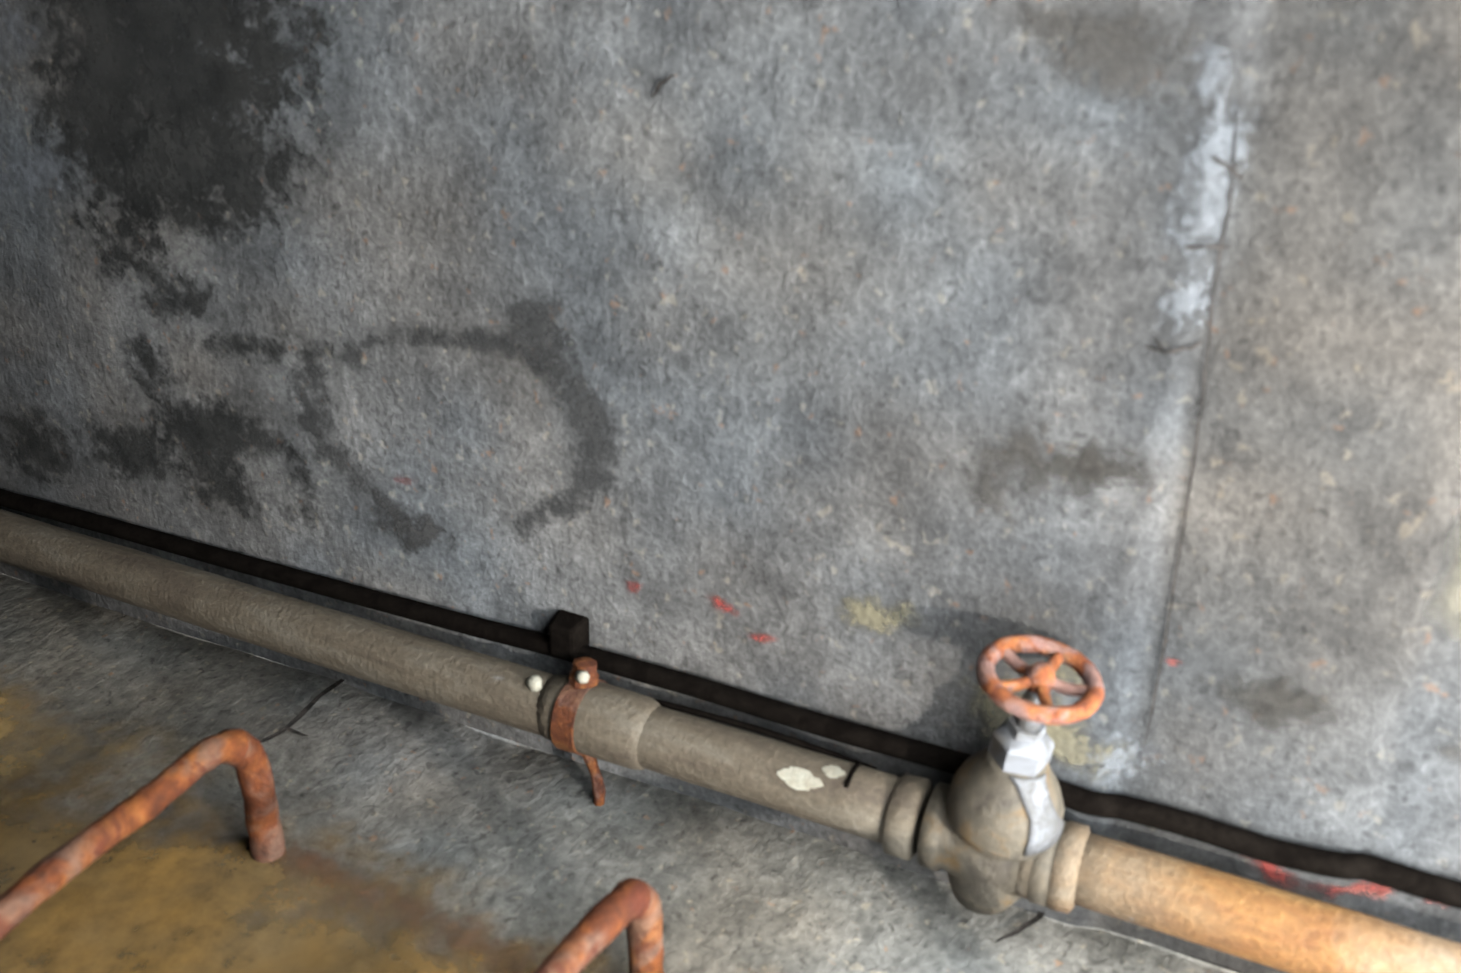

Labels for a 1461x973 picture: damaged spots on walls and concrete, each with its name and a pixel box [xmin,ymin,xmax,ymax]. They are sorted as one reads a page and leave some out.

damp [6,0,328,325]
damp [0,297,619,551]